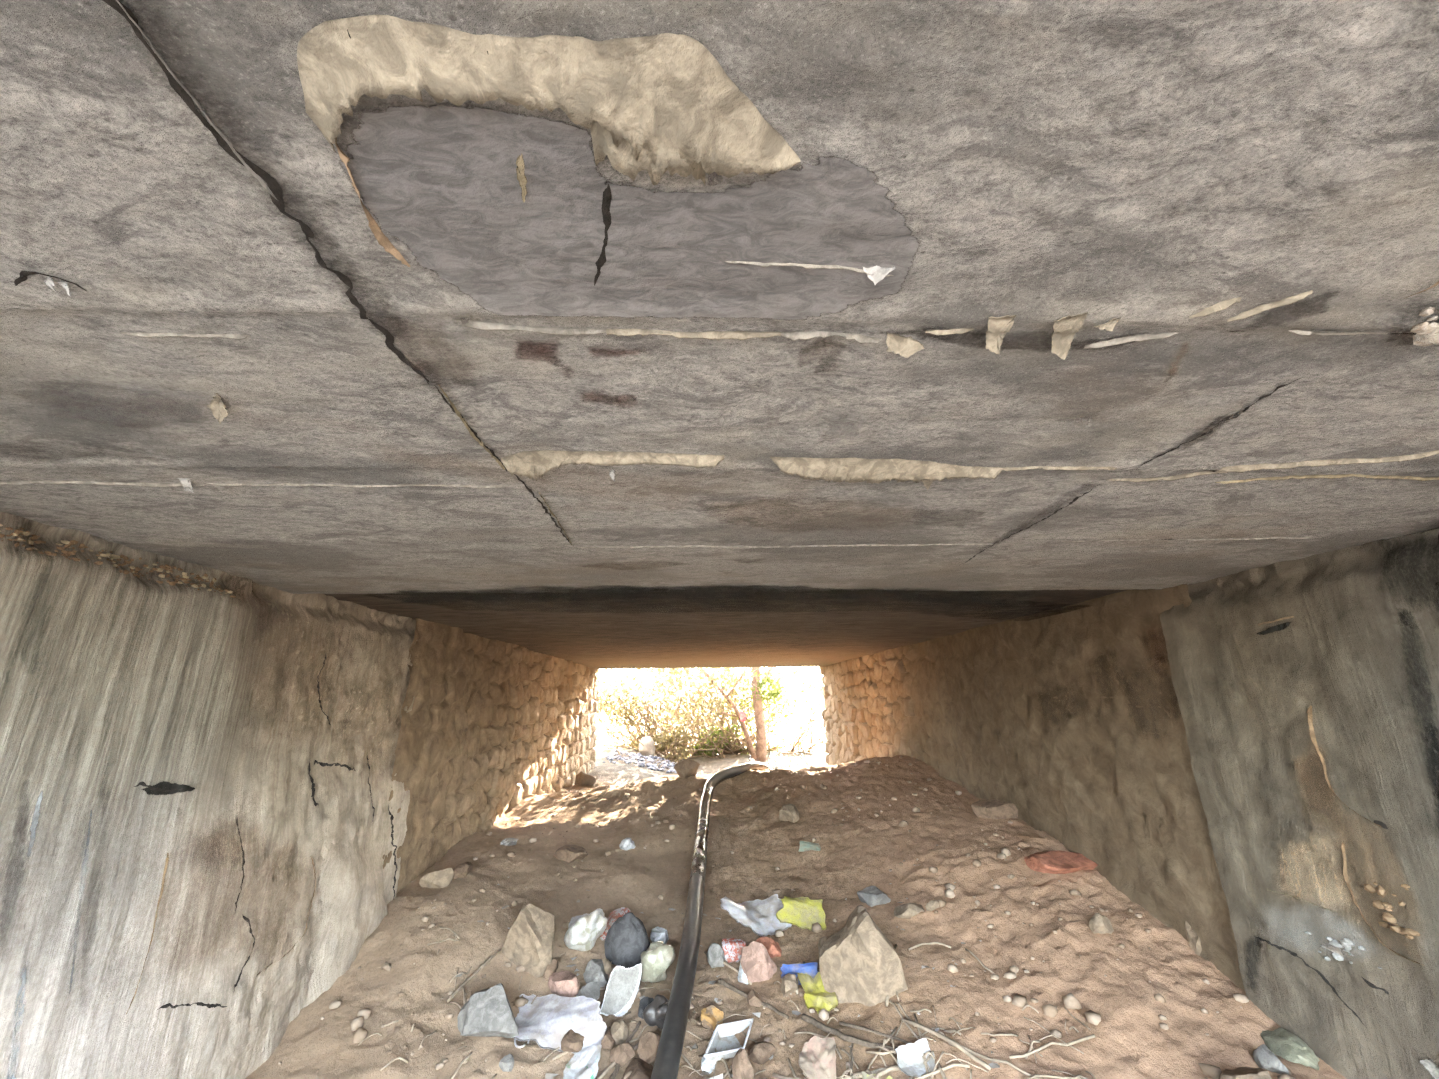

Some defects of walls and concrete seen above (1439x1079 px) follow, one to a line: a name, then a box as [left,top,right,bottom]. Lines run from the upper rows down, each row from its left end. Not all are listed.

crack [14,271,86,297]
peeling [121,332,251,340]
crack [103,0,572,545]
peeling [297,15,1178,360]
spalling [1189,281,1439,347]
damp [1400,613,1439,828]